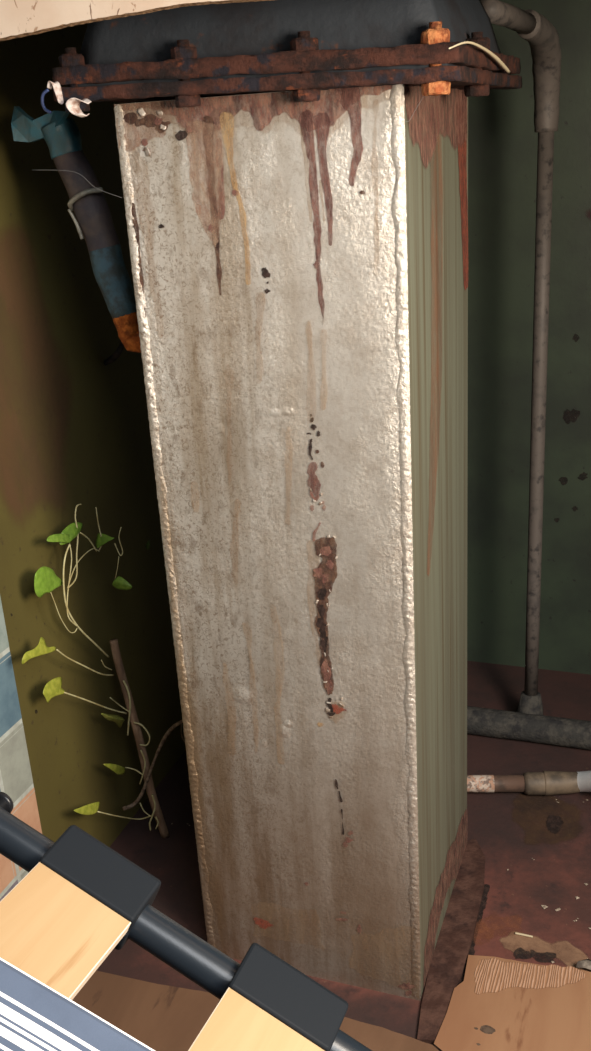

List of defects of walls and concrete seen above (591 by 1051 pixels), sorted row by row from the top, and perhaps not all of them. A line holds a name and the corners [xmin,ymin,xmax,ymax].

rust [115,84,468,318]